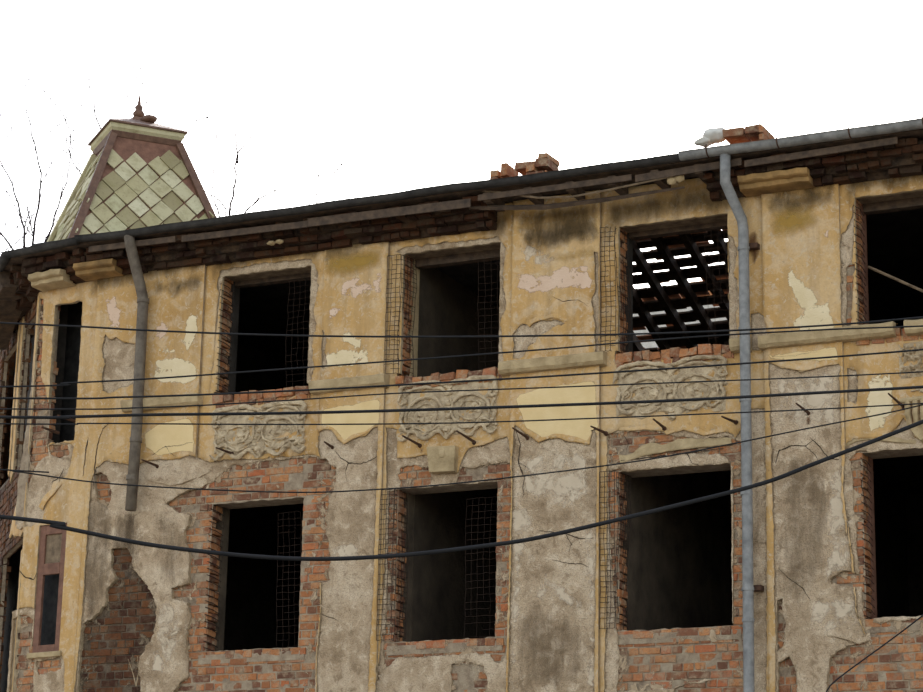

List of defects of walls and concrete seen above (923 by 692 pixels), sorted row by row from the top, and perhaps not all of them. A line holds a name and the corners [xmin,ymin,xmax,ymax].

peeling [100,297,135,393]
peeling [154,315,197,384]
spalling [215,259,368,383]
spalling [397,237,564,362]
peeling [517,246,599,352]
peeling [788,202,860,330]
flaking render [0,297,74,692]
peeling [75,347,923,692]